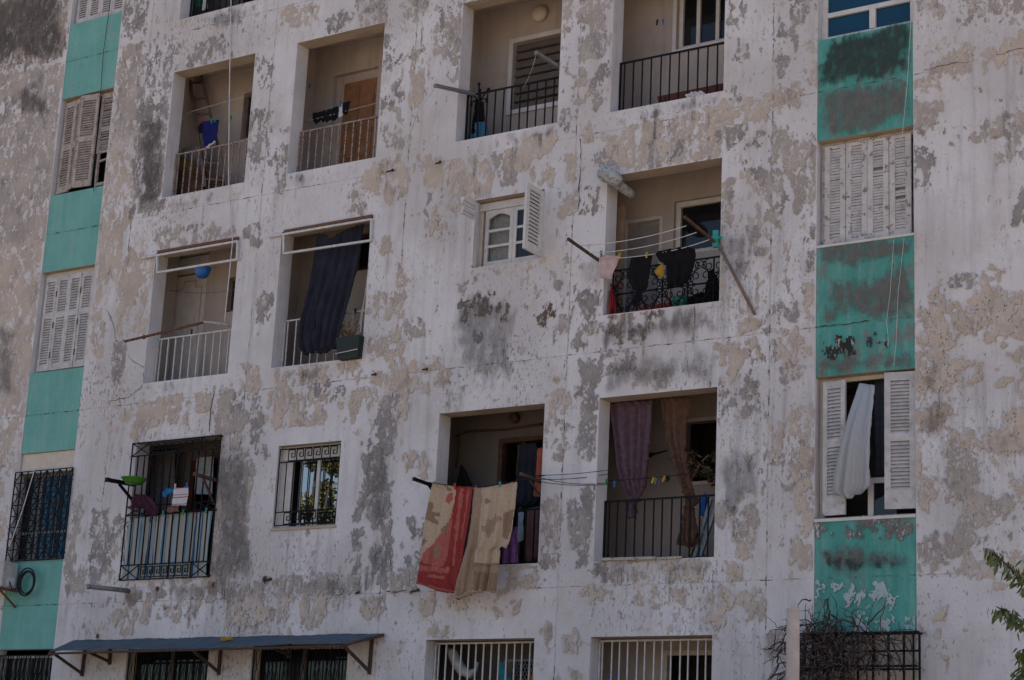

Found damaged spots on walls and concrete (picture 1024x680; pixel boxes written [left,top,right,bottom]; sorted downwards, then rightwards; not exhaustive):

water stain [0,0,59,60]
water stain [819,22,910,84]
water stain [142,122,160,200]
peeling [249,108,288,194]
peeling [280,0,1024,661]
peeling [63,235,459,639]